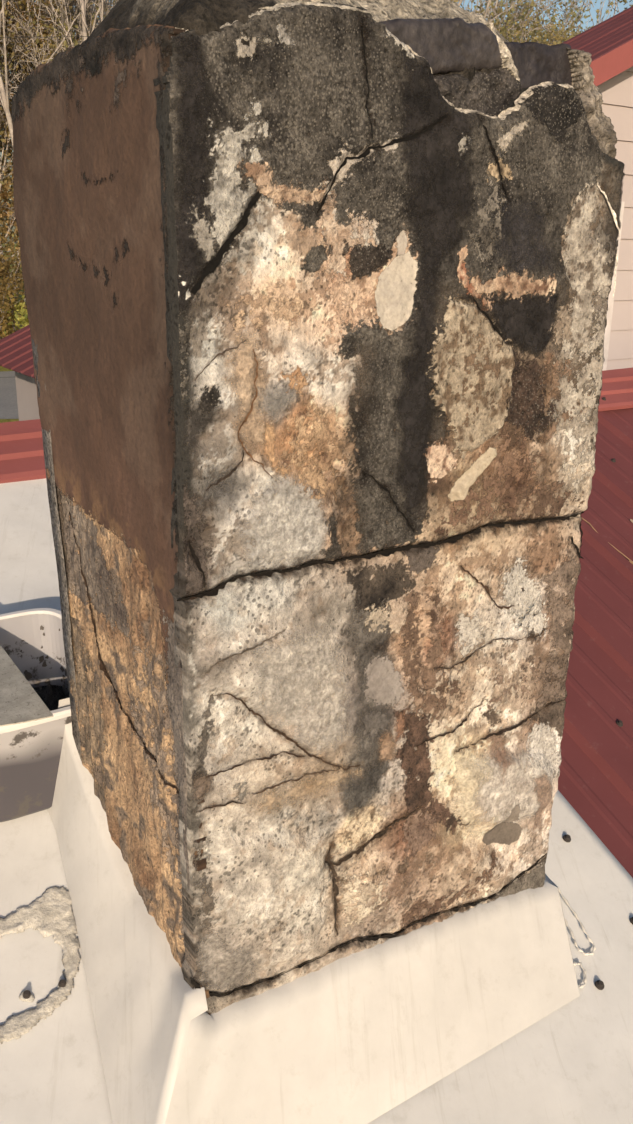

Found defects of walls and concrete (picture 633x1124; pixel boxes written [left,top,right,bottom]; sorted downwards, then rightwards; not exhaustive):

crack [317,17,447,213]
crack [476,112,510,201]
crack [190,191,261,294]
peeling [166,0,620,560]
crack [177,472,584,612]
crack [434,628,548,669]
crack [416,698,566,752]
crack [190,806,544,997]